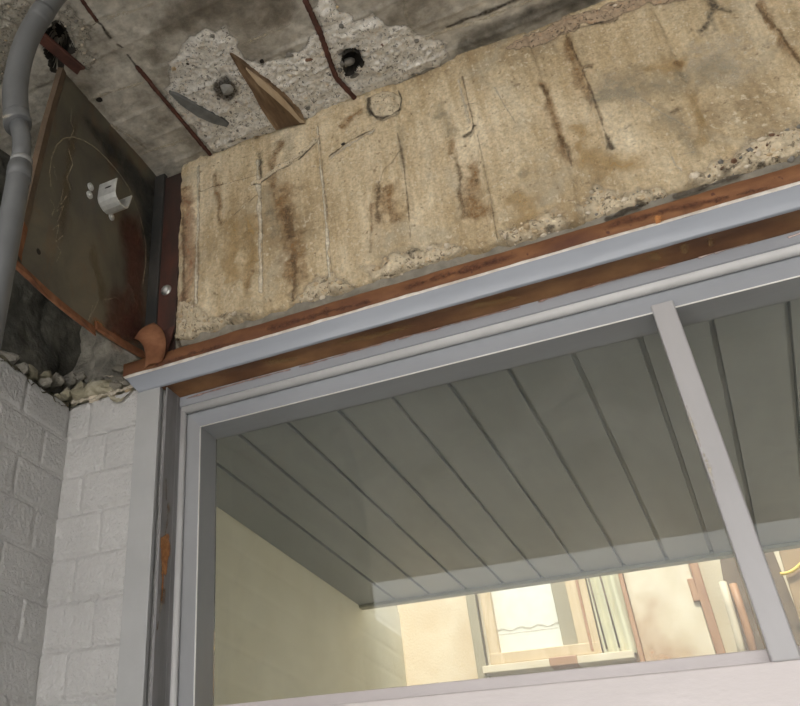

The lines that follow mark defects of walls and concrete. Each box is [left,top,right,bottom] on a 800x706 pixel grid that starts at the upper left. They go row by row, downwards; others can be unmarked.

spalling [165,0,448,152]
crack [235,90,402,214]
crack [458,76,476,137]
spalling [691,127,800,187]
rust [16,163,800,377]
spalling [123,181,800,379]